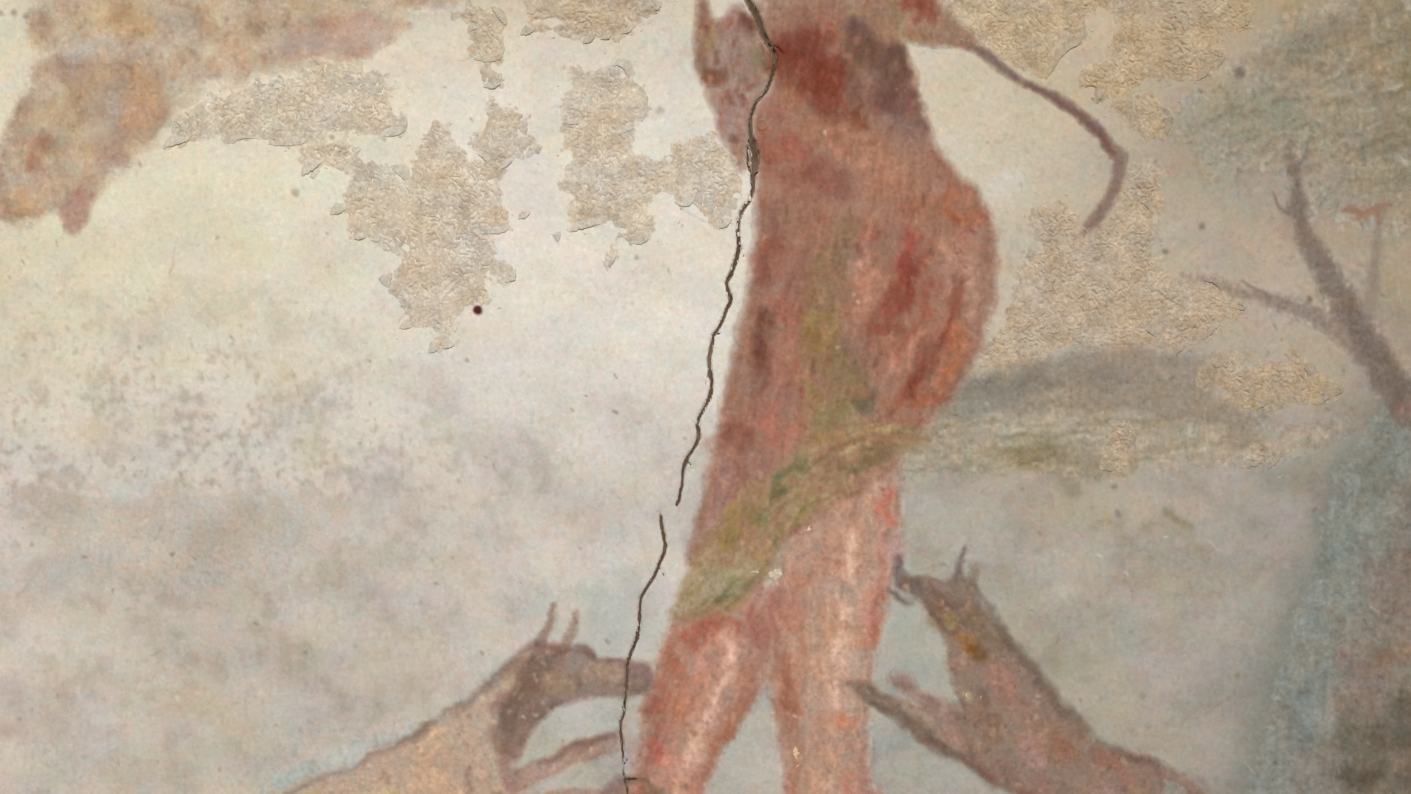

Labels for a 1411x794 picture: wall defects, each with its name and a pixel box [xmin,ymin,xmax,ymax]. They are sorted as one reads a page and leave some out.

peeling [162,0,752,354]
crack [619,0,780,794]
peeling [942,0,1344,418]